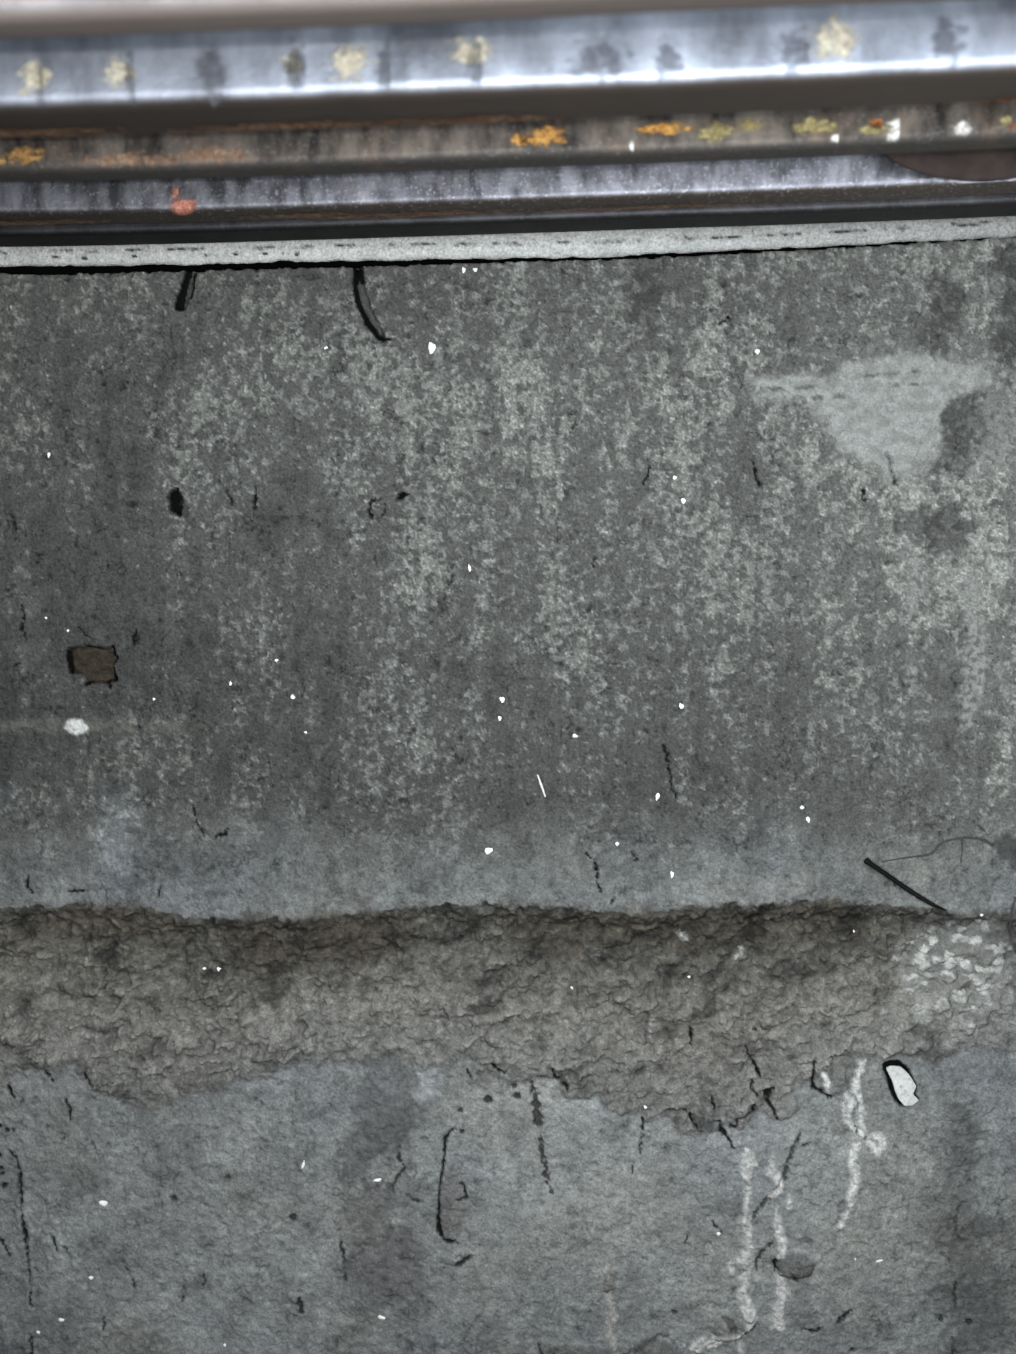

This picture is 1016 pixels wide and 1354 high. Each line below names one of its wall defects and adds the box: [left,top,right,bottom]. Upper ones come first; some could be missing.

rust [630,119,760,150]
rust [794,117,839,142]
rust [860,119,900,139]
rust [955,121,970,134]
rust [172,188,197,215]
crack [0,221,987,275]
spalling [67,650,75,674]
leakage [821,1060,887,1229]
crack [0,1150,69,1354]
leakage [689,1148,794,1354]
leakage [602,1258,620,1354]